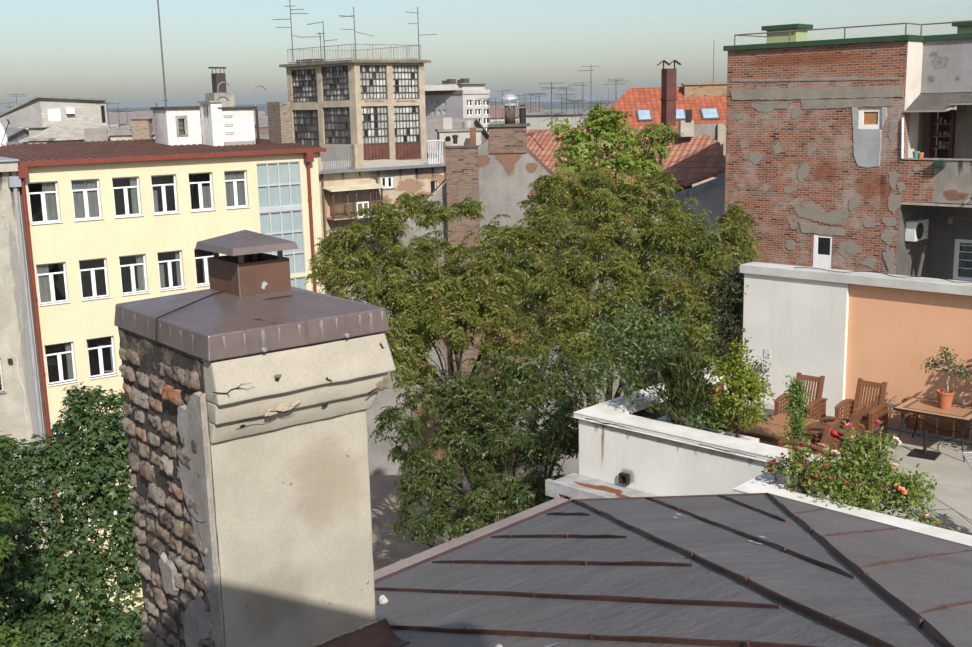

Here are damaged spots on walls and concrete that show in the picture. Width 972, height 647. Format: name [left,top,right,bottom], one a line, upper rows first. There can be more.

peeling [783,145,860,250]
peeling [837,170,906,275]
spalling [265,401,301,416]
flaking render [118,347,223,647]
corrosion [575,482,629,498]